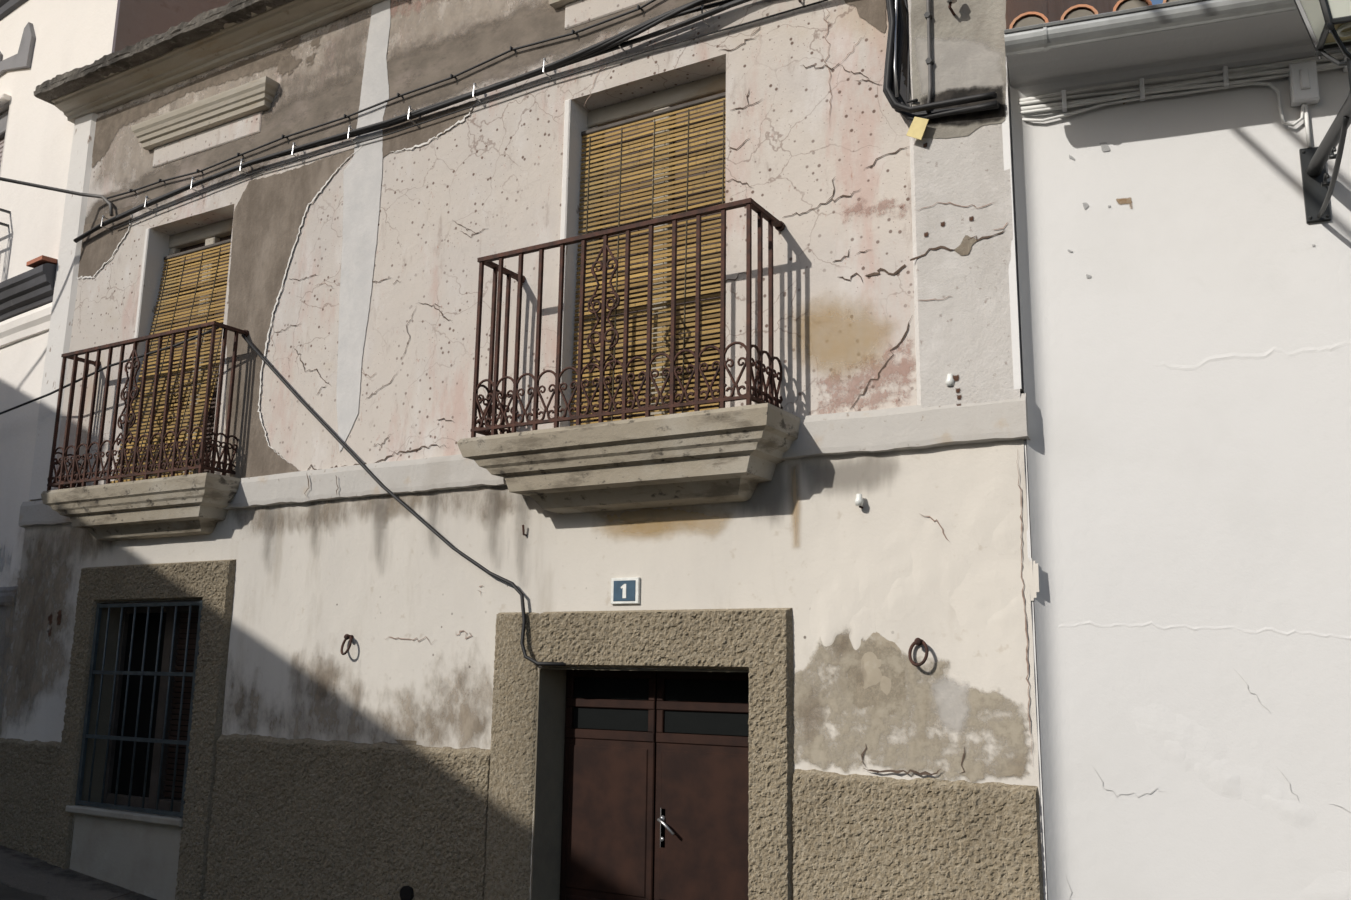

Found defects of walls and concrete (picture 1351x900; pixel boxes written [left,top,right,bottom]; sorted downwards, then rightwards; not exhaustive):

crack [800,1,882,123]
crack [725,91,759,188]
crack [784,147,906,217]
damp [230,667,488,748]